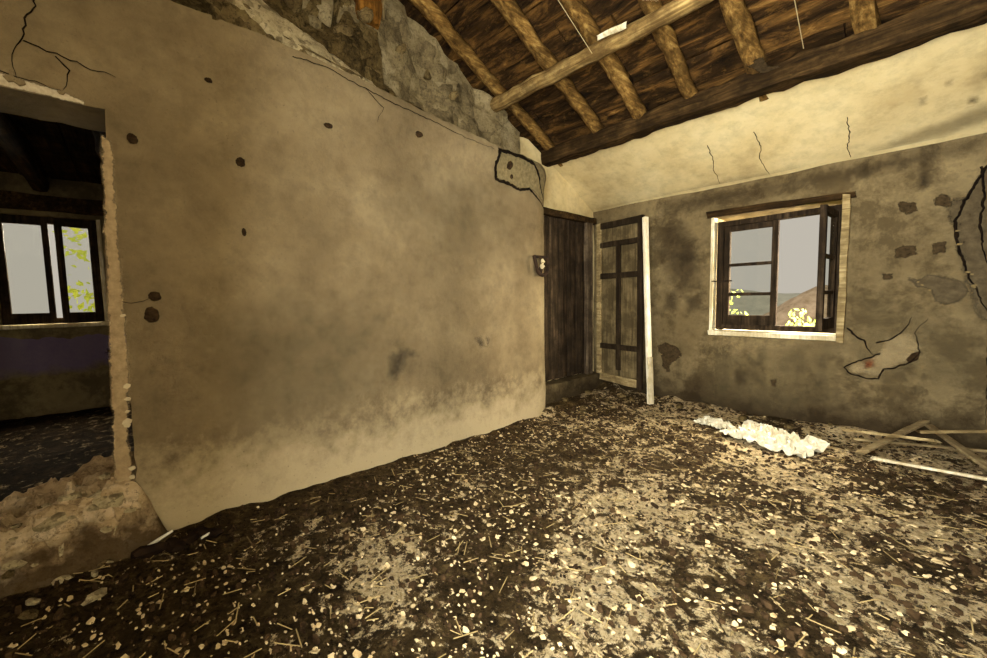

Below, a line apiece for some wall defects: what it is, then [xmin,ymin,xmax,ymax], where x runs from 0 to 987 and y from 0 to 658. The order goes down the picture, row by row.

crack [0,0,115,90]
spalling [895,245,917,258]
spalling [897,201,918,215]
peeling [909,165,987,320]